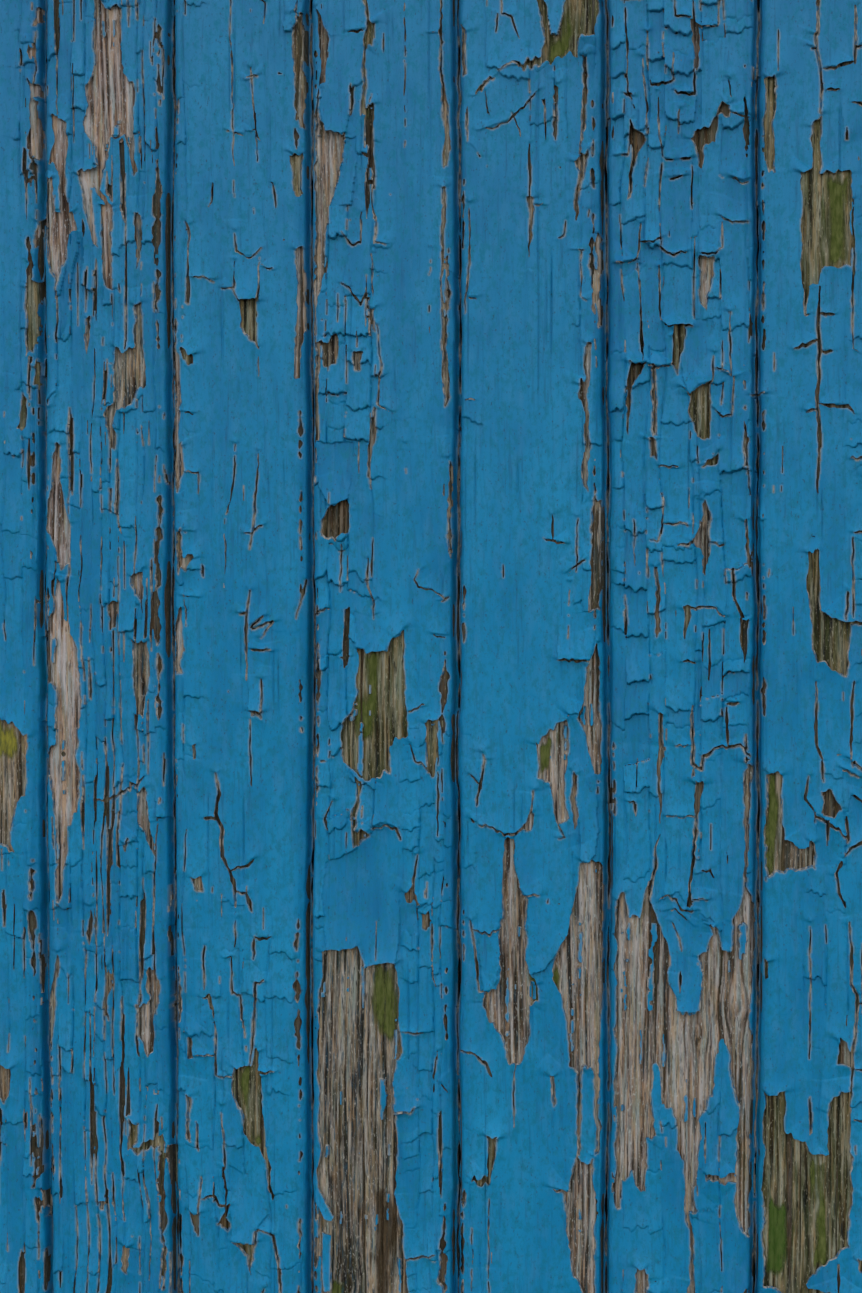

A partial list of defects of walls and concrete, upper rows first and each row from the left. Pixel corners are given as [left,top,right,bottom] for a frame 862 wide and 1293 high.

crack [351,87,406,212]
crack [624,0,696,180]
crack [812,0,862,105]
crack [636,225,717,354]
crack [795,274,855,493]
peeling [0,0,303,1293]
crack [241,601,273,786]
peeling [219,0,862,1293]
crack [684,606,750,770]
crack [804,681,862,908]
crack [203,786,271,1074]
crack [198,1148,230,1214]